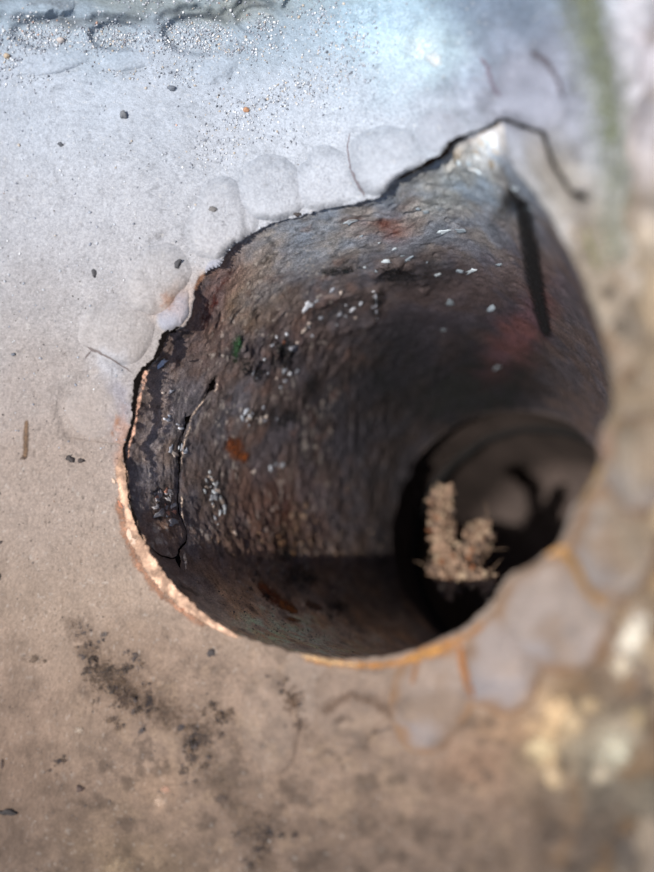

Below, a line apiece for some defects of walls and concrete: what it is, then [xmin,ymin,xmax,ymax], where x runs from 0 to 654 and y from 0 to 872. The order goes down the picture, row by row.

peeling [453,135,500,176]
crack [396,50,589,200]
spalling [240,247,448,388]
peeling [163,414,189,460]
spalling [240,371,322,432]
spalling [112,459,238,638]
rust [257,581,322,622]
rust [304,623,484,697]